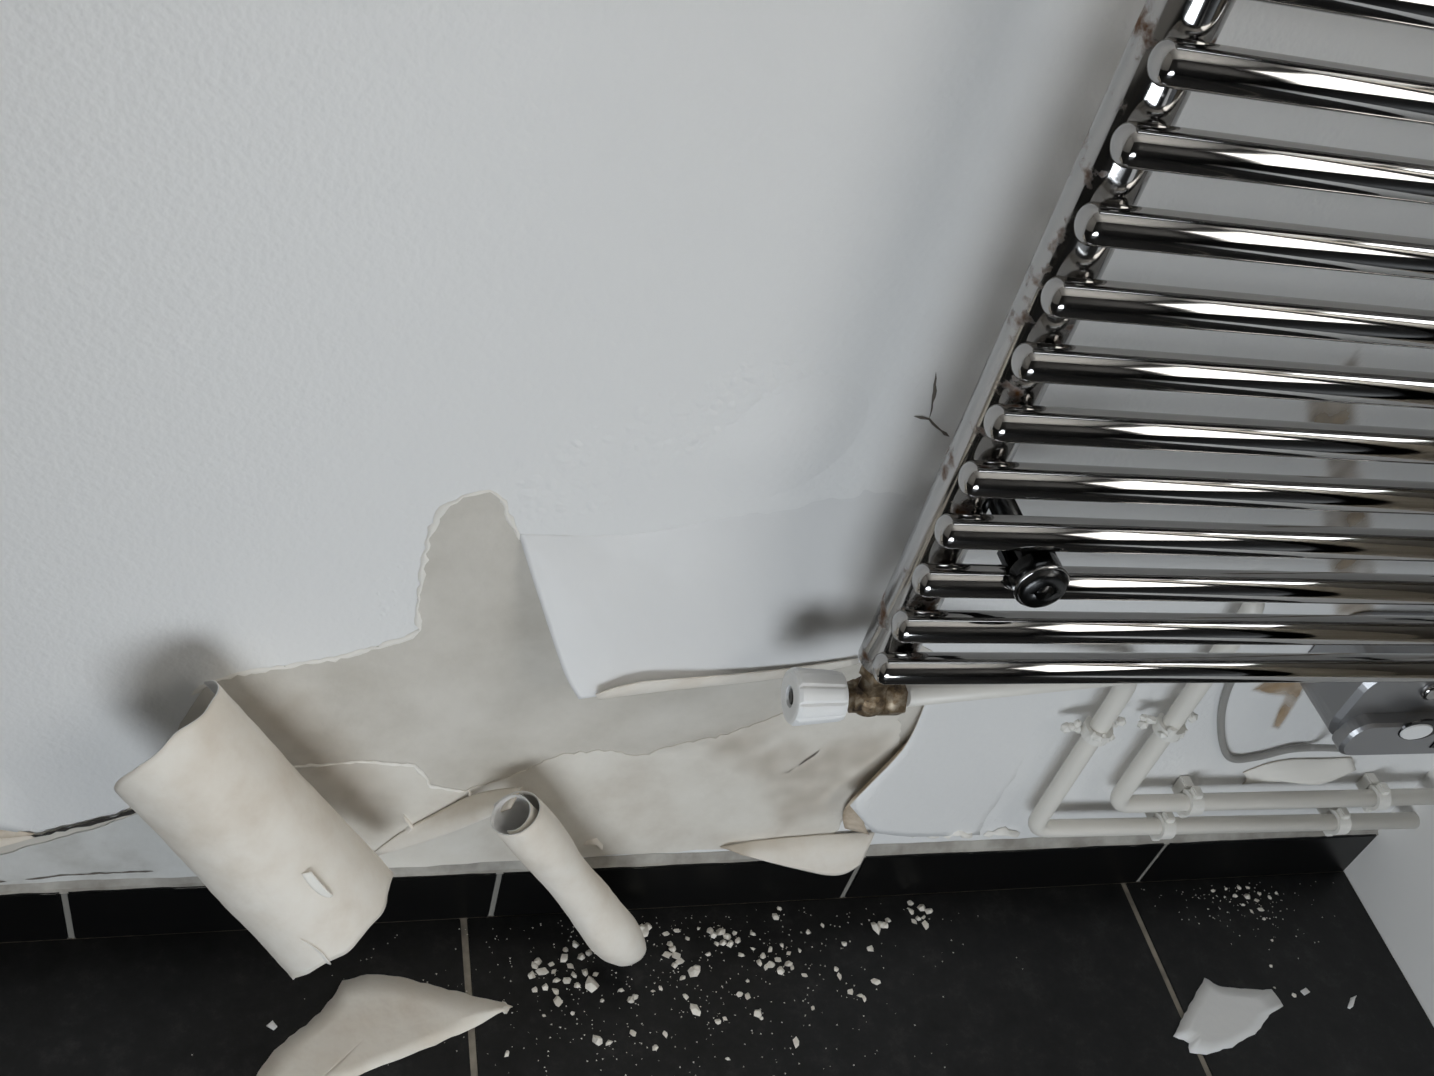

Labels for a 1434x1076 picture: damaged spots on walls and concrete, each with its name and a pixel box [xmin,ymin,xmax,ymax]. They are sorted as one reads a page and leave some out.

flaking render [0,490,1034,980]
crack [31,810,136,837]
crack [0,871,153,883]